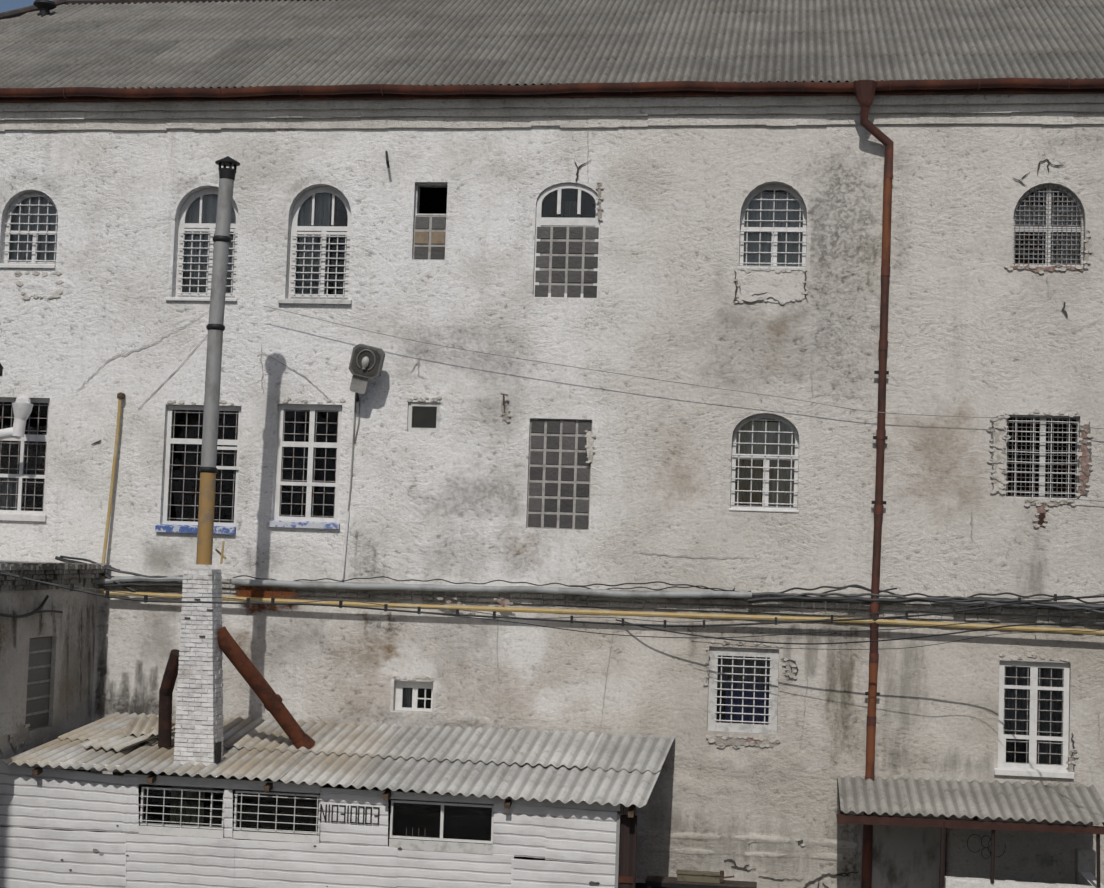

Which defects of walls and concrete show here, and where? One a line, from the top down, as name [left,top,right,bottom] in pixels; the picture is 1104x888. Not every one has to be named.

peeling [734,267,808,305]
flaking render [987,409,1094,528]
rust [236,586,295,614]
water stain [67,626,157,715]